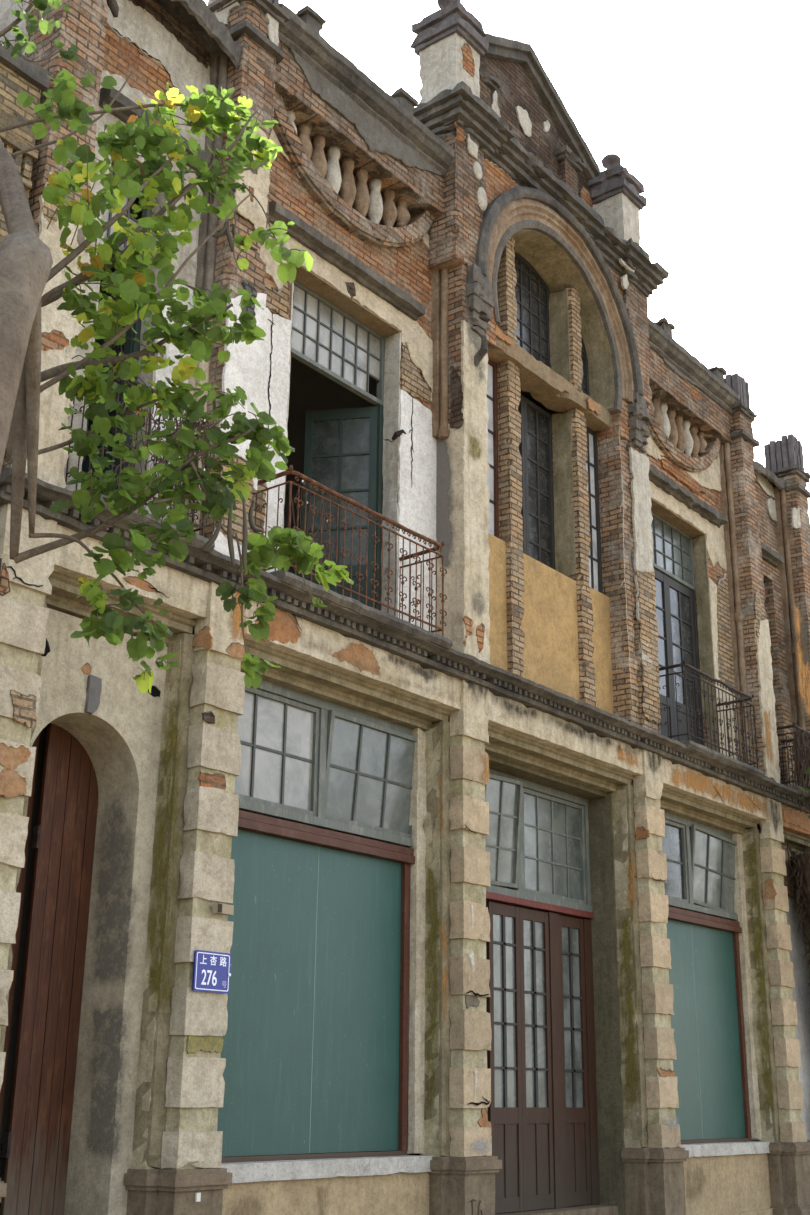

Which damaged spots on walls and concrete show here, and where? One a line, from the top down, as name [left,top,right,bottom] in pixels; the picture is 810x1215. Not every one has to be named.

spalling [102,21,180,103]
peeling [235,120,300,230]
crack [267,311,275,450]
spalling [400,341,432,403]
spalling [449,365,464,429]
spalling [216,453,268,551]
spalling [10,689,37,728]
spalling [0,741,31,798]
leakage [95,805,136,980]
leakage [148,703,180,1006]
leakage [619,920,638,1106]
leakage [747,845,775,1108]